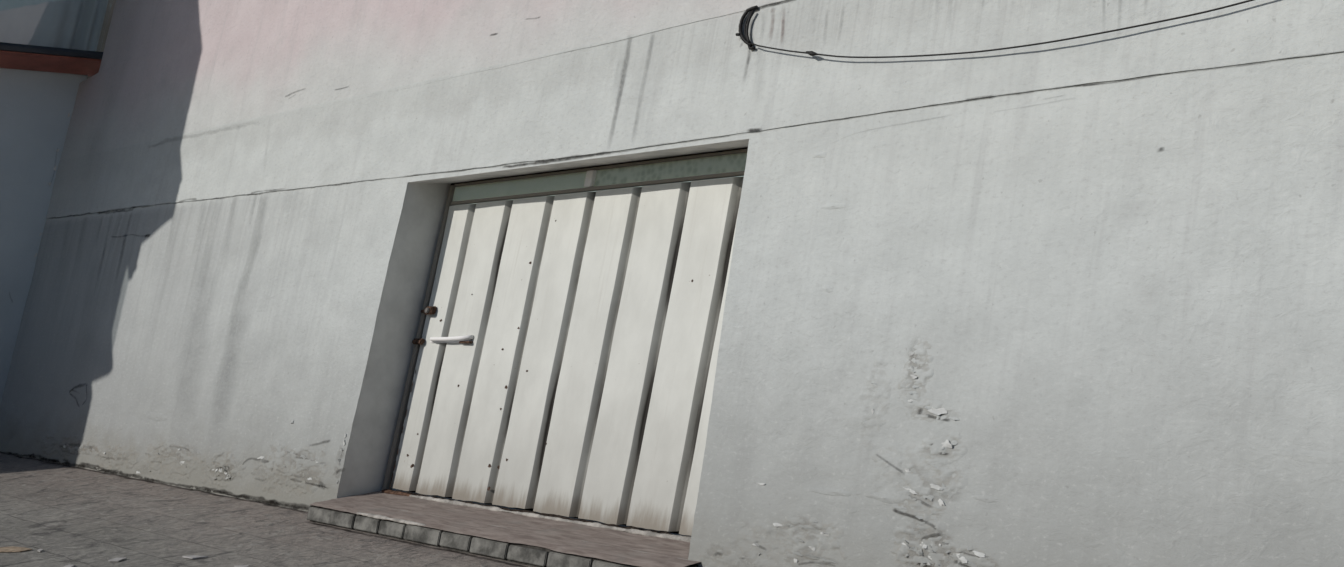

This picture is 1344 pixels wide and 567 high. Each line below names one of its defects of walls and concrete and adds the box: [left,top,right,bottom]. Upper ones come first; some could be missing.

peeling [36,432,150,474]
peeling [197,449,247,496]
peeling [867,398,998,567]